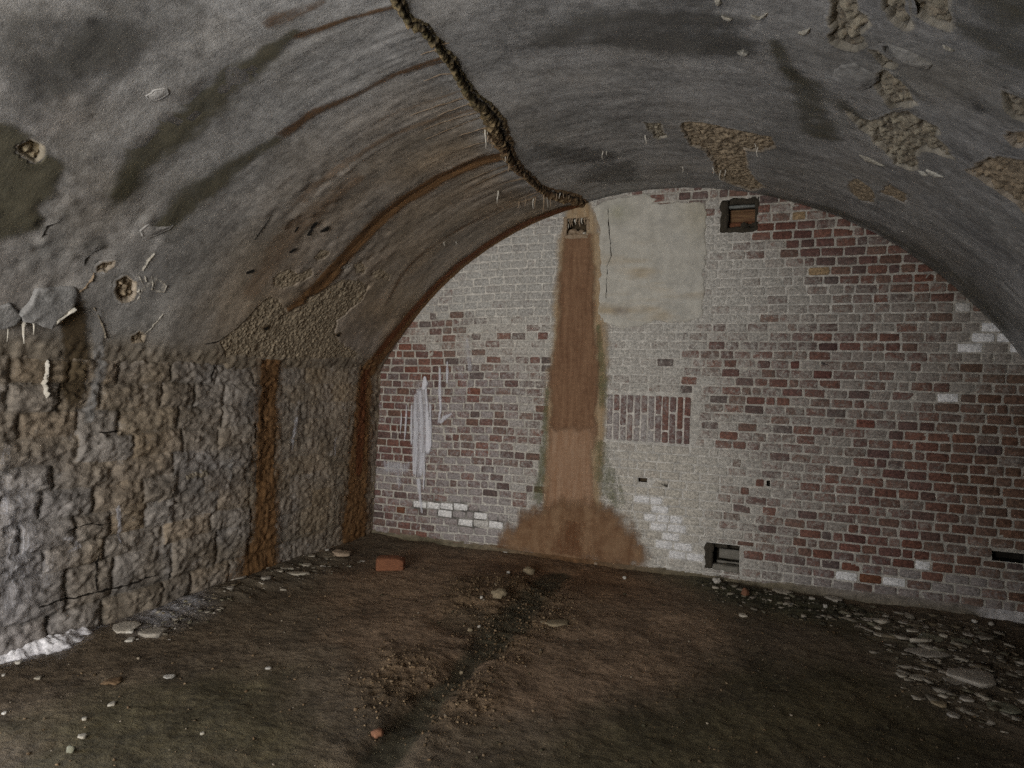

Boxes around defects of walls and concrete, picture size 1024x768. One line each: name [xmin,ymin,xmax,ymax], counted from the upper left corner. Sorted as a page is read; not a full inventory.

flaking render [798,0,959,54]
flaking render [15,135,49,164]
crack [390,0,612,292]
flaking render [677,120,779,192]
flaking render [842,68,1024,215]
peeling [0,286,78,344]
flaking render [93,258,140,305]
rust [236,359,280,578]
flaking render [218,248,372,362]
rust [287,153,502,311]
efflorescence [384,362,452,508]
rust [341,203,645,566]